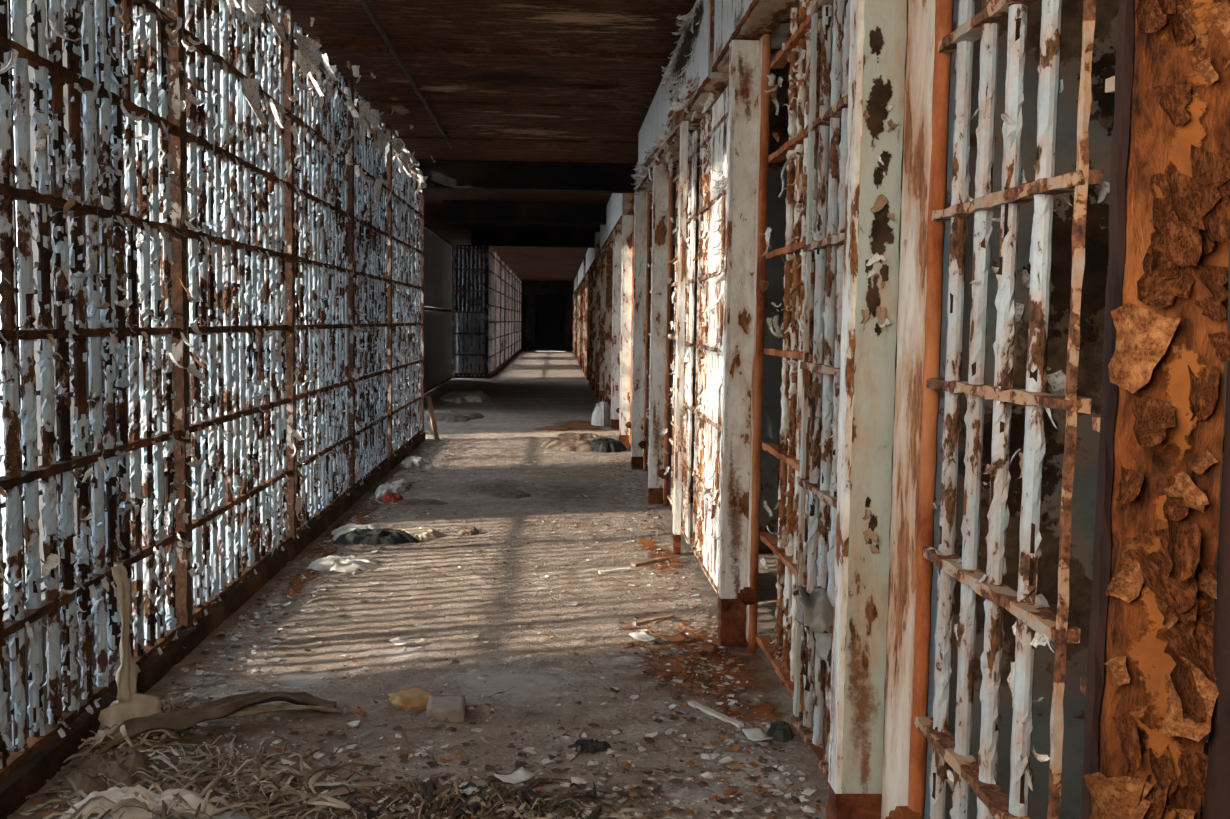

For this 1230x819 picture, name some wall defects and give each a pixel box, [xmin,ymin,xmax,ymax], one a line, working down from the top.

peeling [0,49,18,74]
peeling [172,0,209,112]
peeling [120,100,150,140]
peeling [226,0,507,205]
peeling [860,26,898,337]
peeling [72,235,92,277]
peeling [97,286,133,309]
peeling [169,323,210,383]
peeling [179,430,206,468]
peeling [290,429,305,479]
peeling [161,483,196,576]
peeling [41,553,60,577]